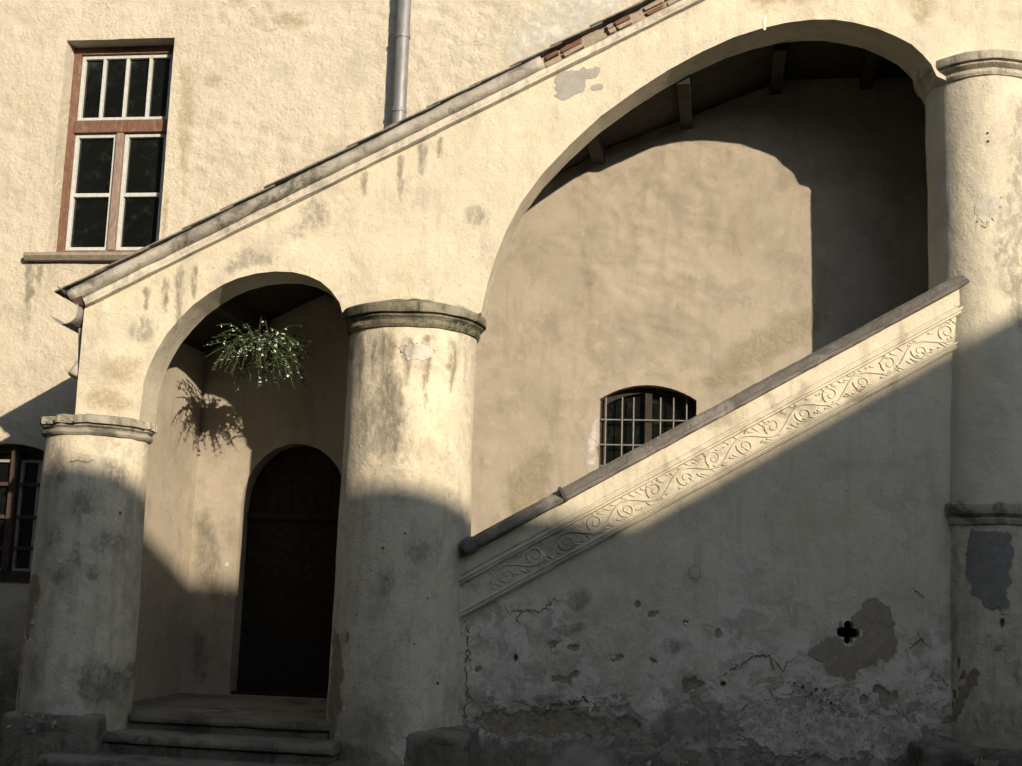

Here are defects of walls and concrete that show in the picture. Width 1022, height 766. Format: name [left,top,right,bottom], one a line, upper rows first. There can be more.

leakage [349,337,409,449]
crack [505,597,558,624]
peeling [328,626,349,740]
crack [717,652,797,677]
peeling [737,682,923,762]